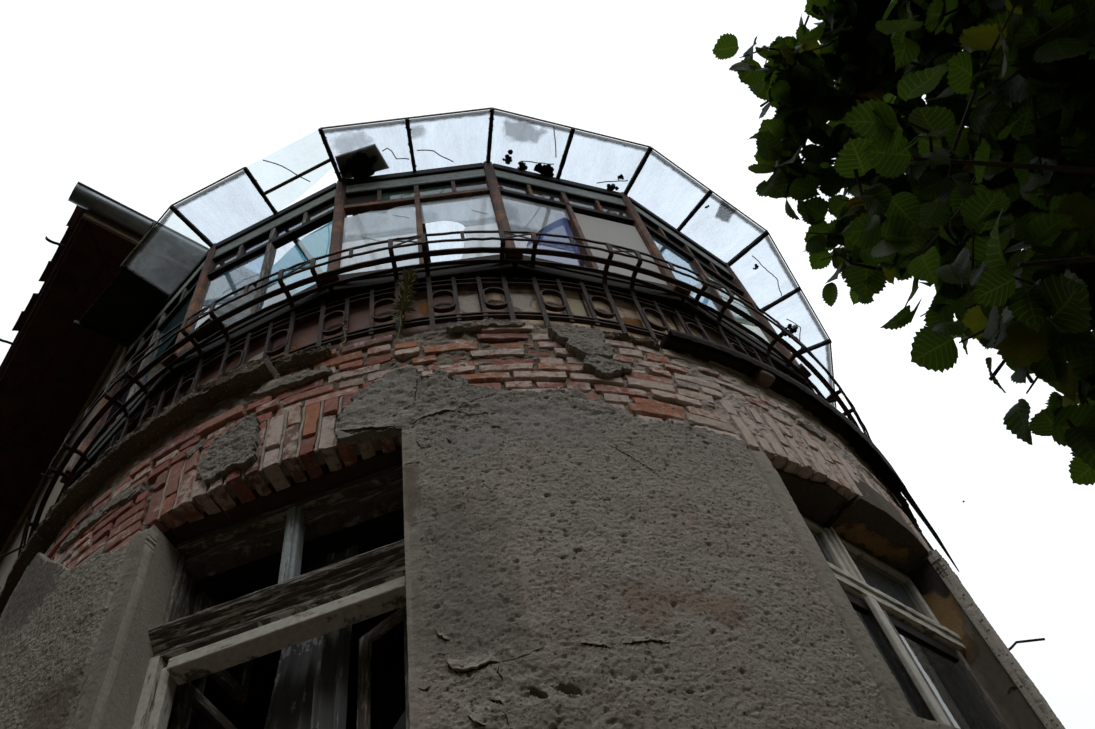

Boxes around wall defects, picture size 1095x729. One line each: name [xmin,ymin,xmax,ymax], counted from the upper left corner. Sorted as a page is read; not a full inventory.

peeling [458,294,481,313]
peeling [510,294,538,312]
peeling [567,299,590,317]
crack [340,382,511,465]
spalling [40,325,932,569]